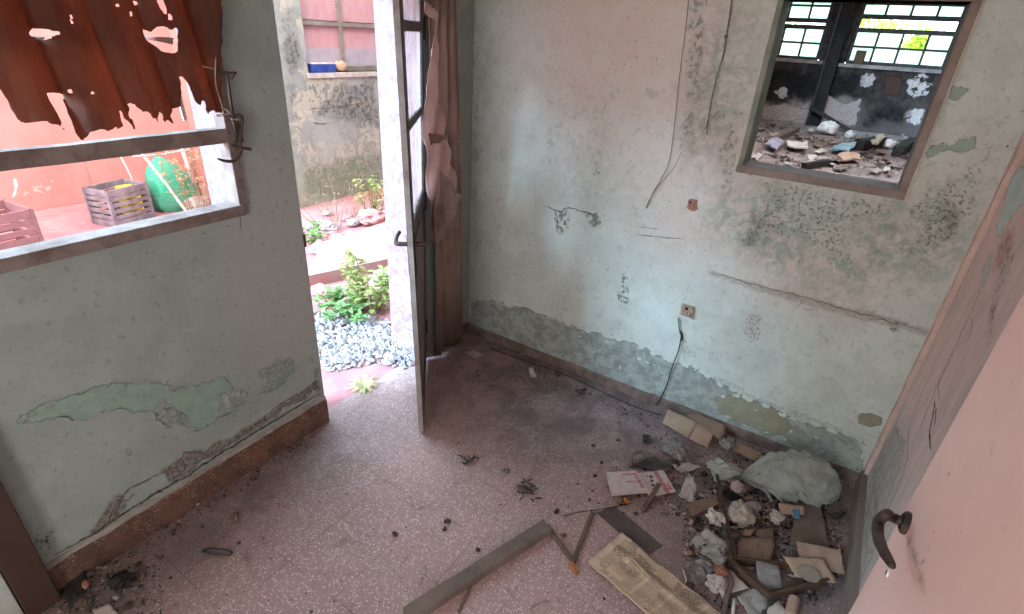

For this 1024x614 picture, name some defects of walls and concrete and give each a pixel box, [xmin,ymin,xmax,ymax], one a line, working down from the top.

peeling [926,135,976,158]
peeling [553,209,569,235]
damp [754,187,889,243]
damp [912,169,976,245]
peeling [981,167,1024,287]
crack [707,271,928,332]
flaking render [470,299,907,588]
crack [517,290,981,524]